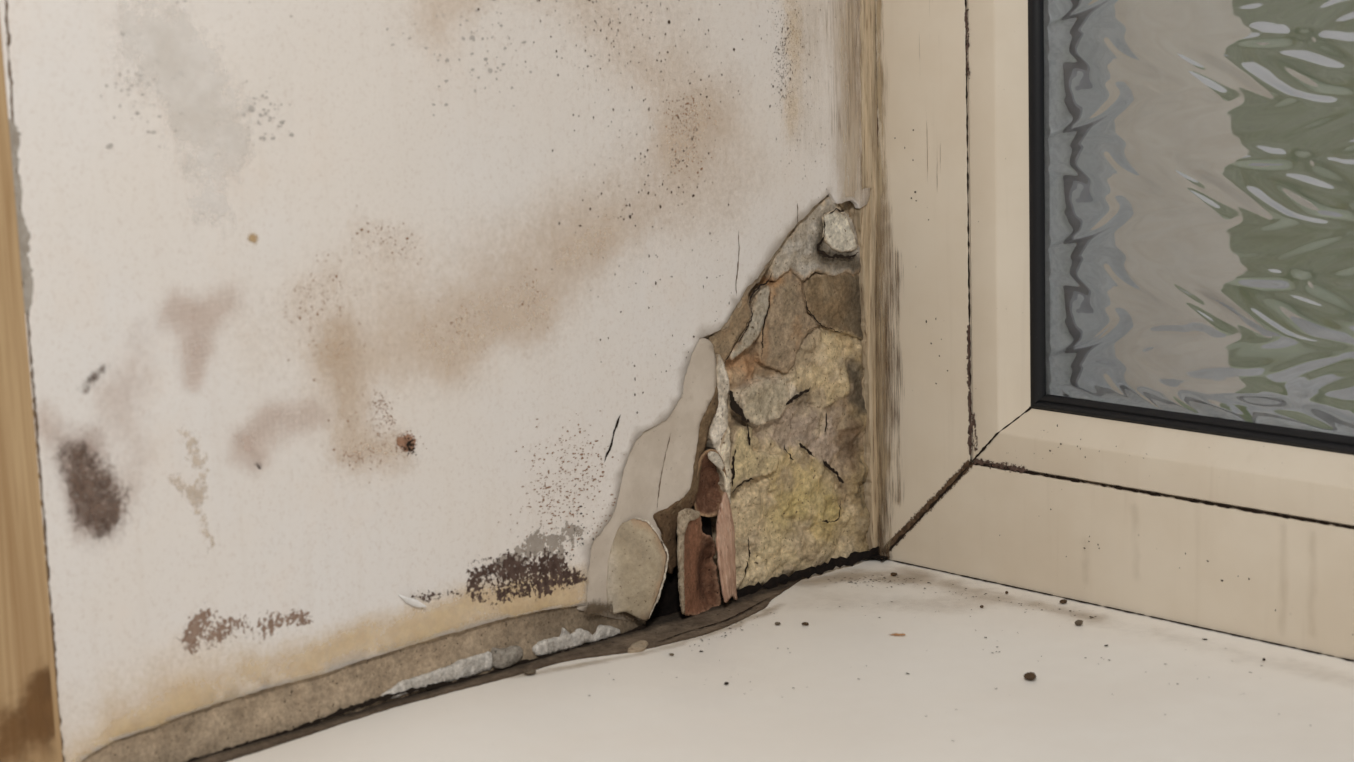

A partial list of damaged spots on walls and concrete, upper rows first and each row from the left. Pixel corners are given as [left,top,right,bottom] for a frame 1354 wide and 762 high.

water stain [242,78,294,146]
water stain [425,0,534,93]
water stain [550,0,740,233]
water stain [754,1,836,177]
water stain [875,246,901,379]
water stain [60,443,121,538]
water stain [322,384,427,483]
flaking render [81,195,880,762]
water stain [177,608,313,655]
water stain [104,684,216,740]